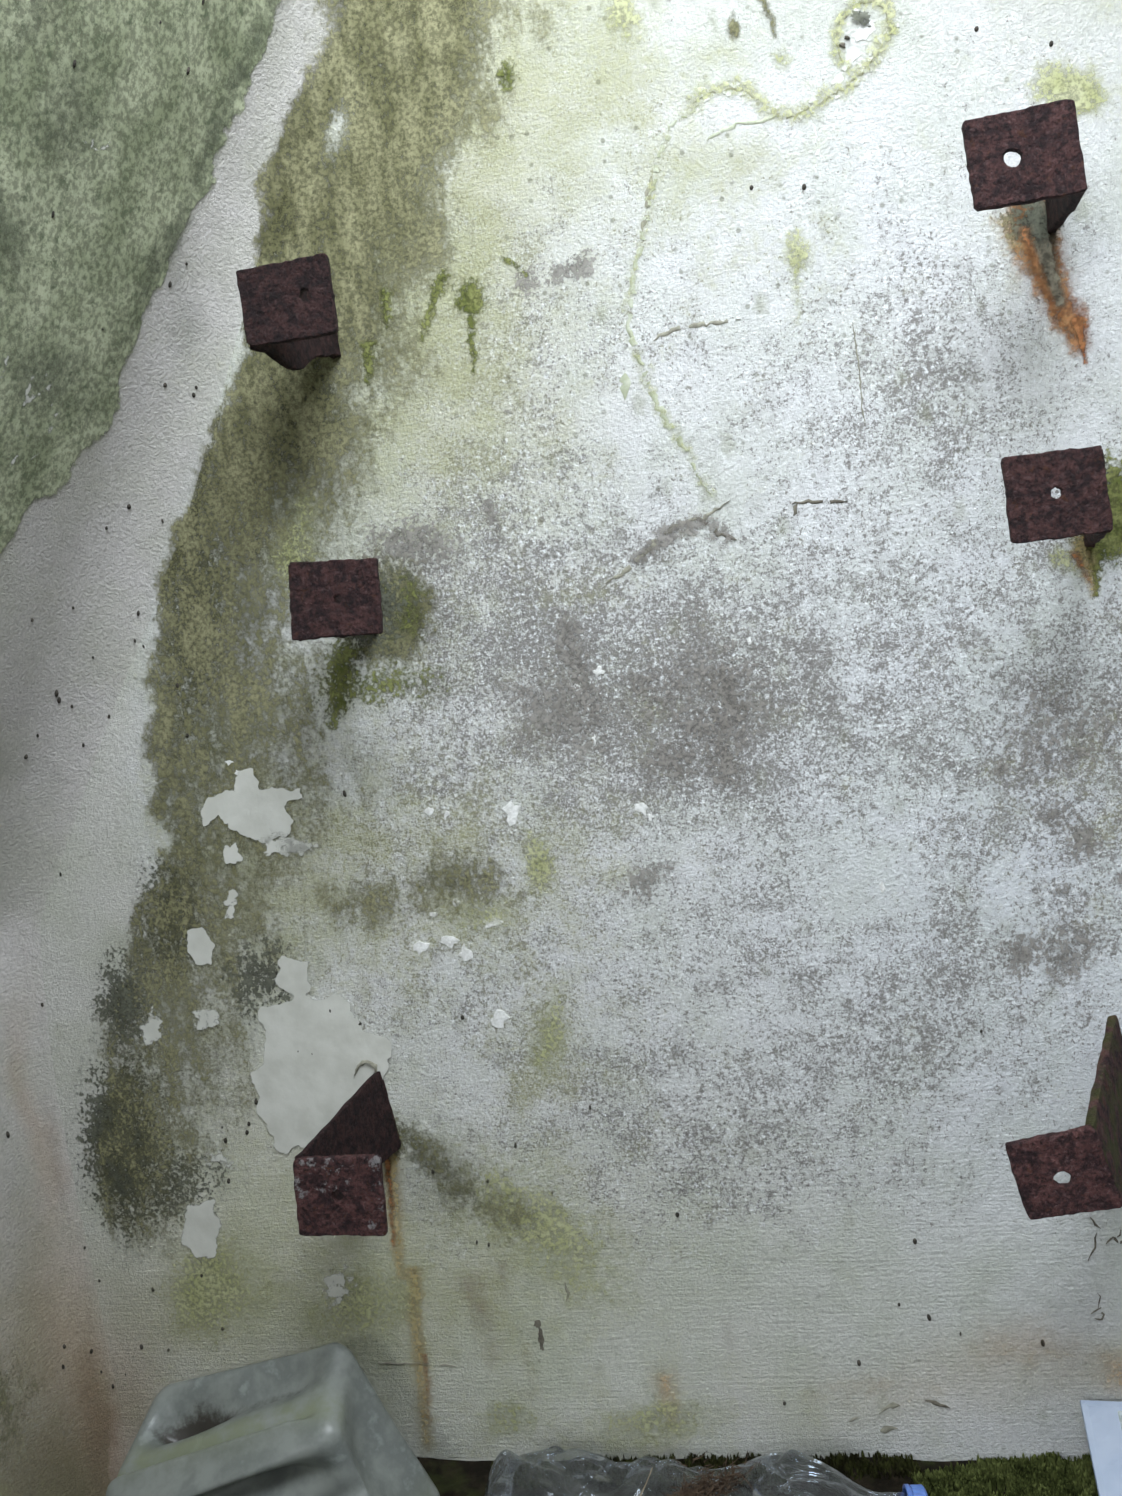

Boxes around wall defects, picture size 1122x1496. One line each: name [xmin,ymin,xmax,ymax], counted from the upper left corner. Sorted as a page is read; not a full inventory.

damp [253,0,355,267]
damp [420,268,450,342]
damp [503,248,596,296]
rust [998,200,1089,364]
peeling [200,760,318,864]
damp [75,944,226,1243]
peeling [139,1006,163,1046]
peeling [187,927,215,965]
peeling [223,889,241,919]
damp [216,930,292,1025]
peeling [250,956,392,1155]
rust [385,1153,429,1442]